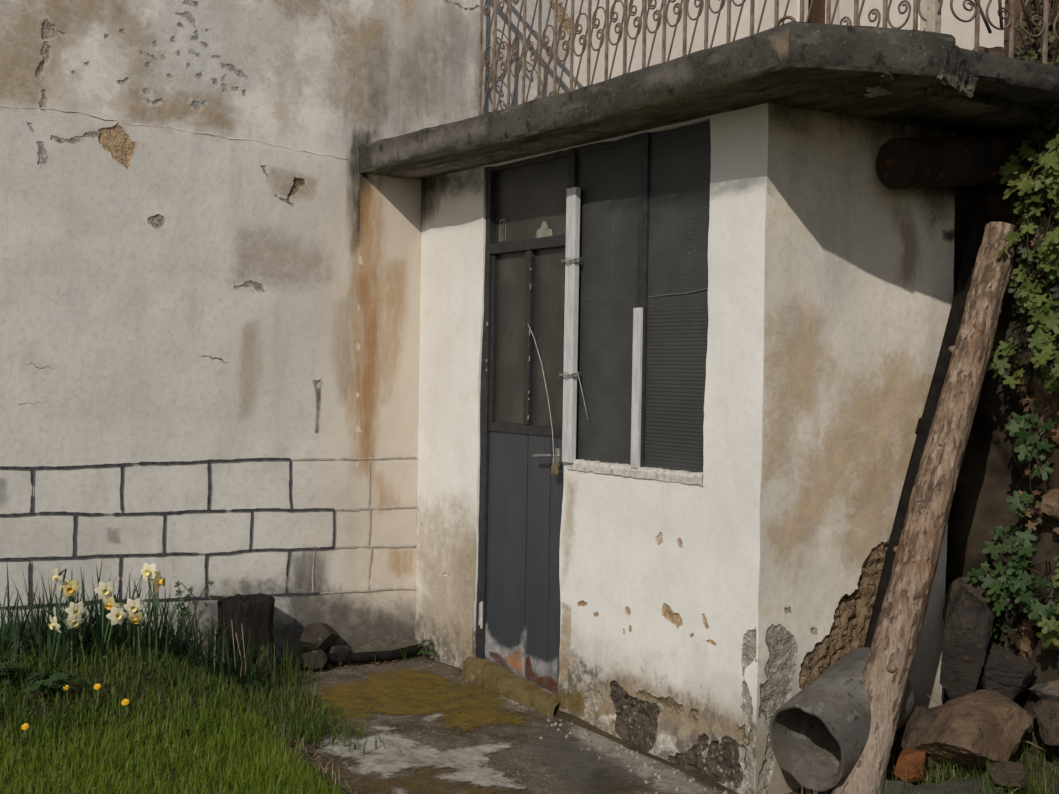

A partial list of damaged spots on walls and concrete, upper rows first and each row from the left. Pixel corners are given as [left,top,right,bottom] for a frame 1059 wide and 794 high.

peeling [35,19,65,111]
peeling [139,0,248,97]
peeling [27,122,138,169]
spalling [275,176,312,207]
water stain [350,134,371,241]
rust [363,309,376,409]
water stain [770,360,930,561]
water stain [275,517,476,659]
rust [490,653,558,694]
spalling [584,534,891,794]